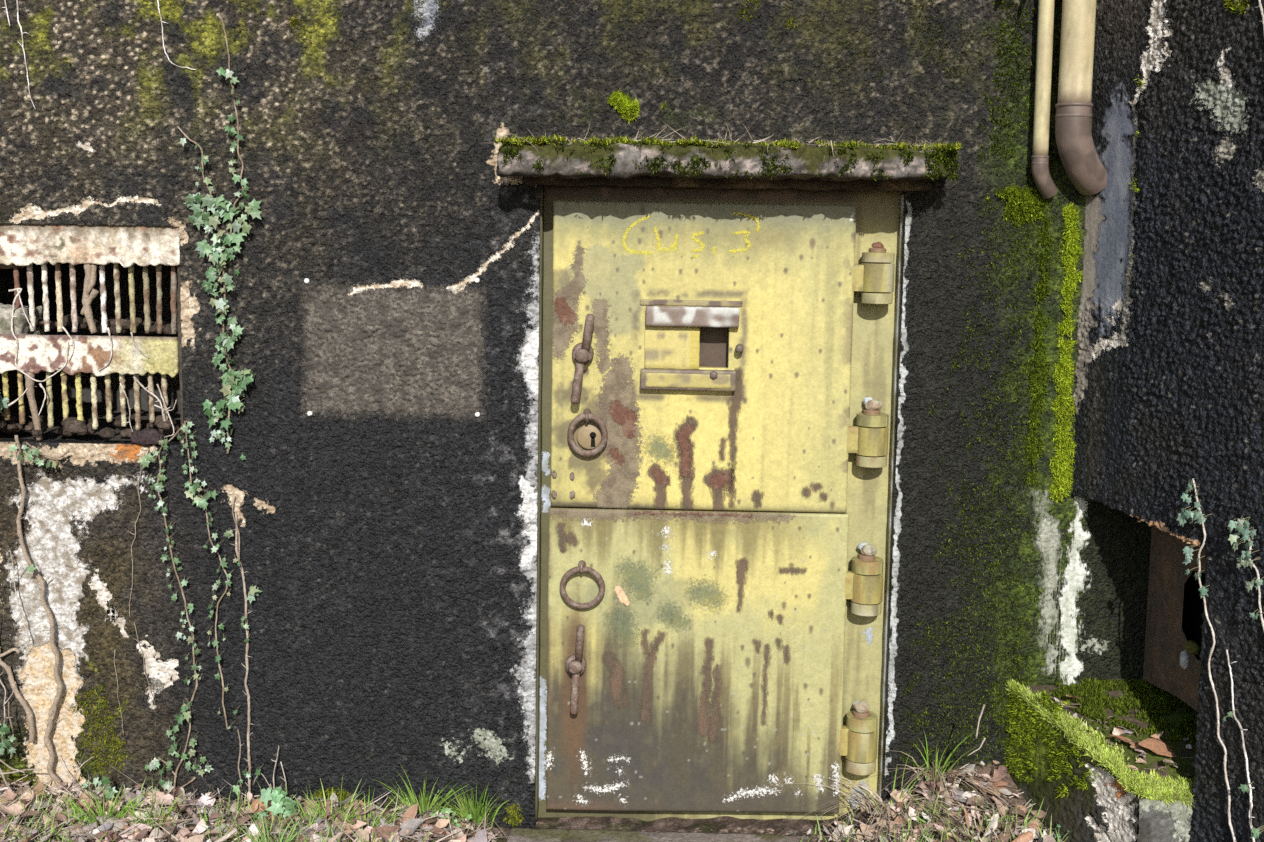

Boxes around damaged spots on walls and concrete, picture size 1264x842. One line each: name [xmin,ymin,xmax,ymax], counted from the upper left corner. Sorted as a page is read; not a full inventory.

spalling [0,262,201,348]
crack [347,210,540,296]
flaking render [1073,83,1138,414]
corrosion [549,245,797,553]
peeling [510,231,555,800]
spalling [0,370,181,788]
corrosion [736,558,748,611]
corrosion [603,629,665,724]
corrosion [698,638,721,743]
corrosion [752,611,789,725]
peeling [573,748,632,806]
spalling [1084,763,1193,842]